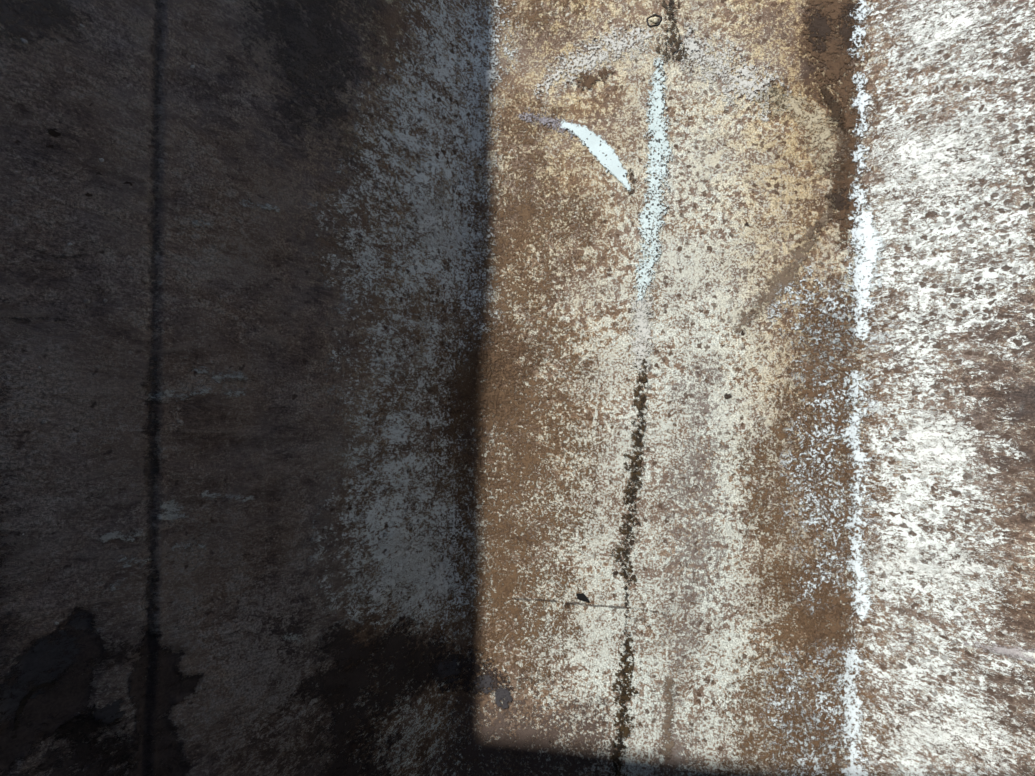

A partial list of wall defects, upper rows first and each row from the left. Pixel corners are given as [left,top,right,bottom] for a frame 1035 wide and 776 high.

leakage [238,0,385,172]
rust [495,0,588,47]
rust [575,67,613,90]
crack [656,0,689,62]
rust [425,91,609,695]
rust [718,268,898,776]
leakage [290,611,631,776]